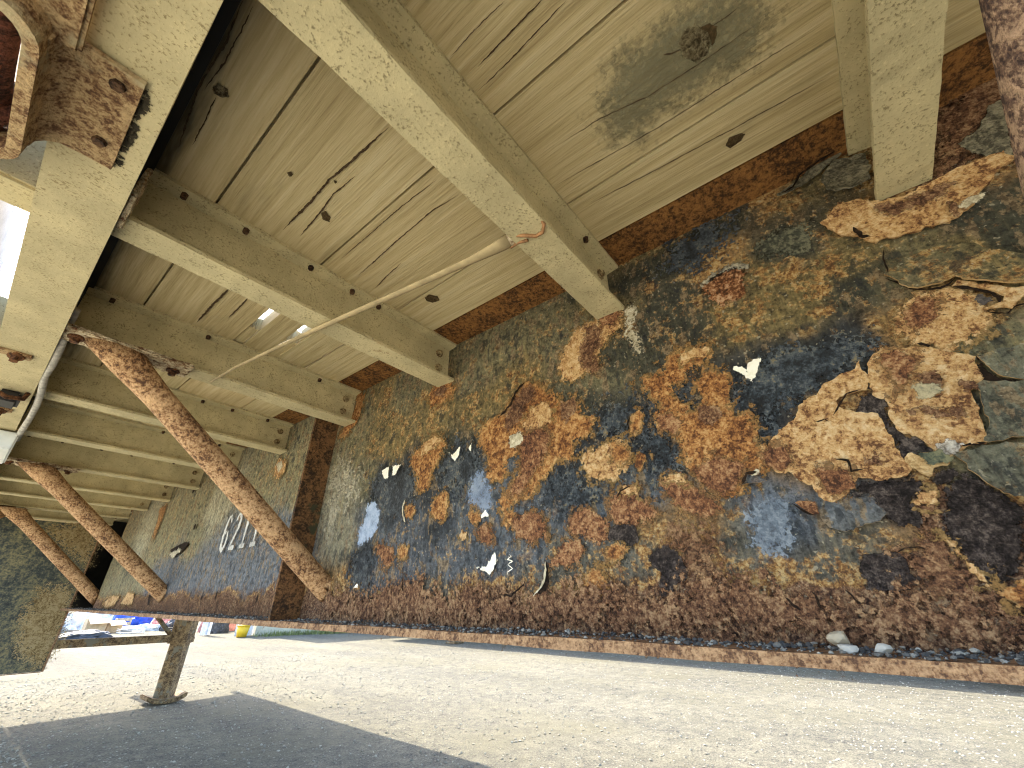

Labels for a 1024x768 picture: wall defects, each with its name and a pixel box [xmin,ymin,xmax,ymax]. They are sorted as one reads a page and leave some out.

peeling [777,152,871,196]
corrosion [699,261,750,307]
peeling [884,242,1024,310]
peeling [904,344,1024,497]
corrosion [272,454,288,481]
peeling [382,464,401,479]
corrosion [320,283,1024,657]
corrosion [43,522,101,570]
peeling [477,553,498,575]